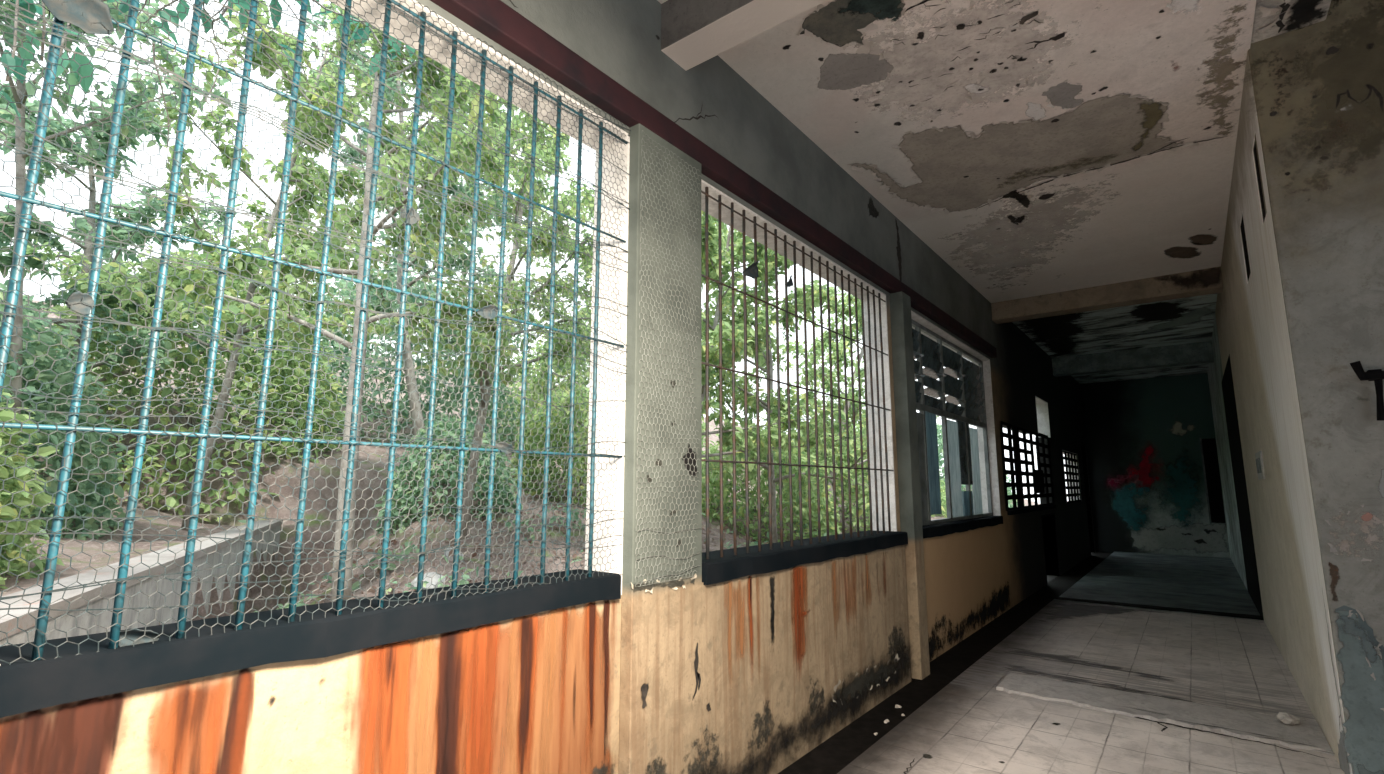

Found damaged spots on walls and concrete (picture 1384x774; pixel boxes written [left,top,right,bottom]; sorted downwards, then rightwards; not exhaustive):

peeling [783,0,1211,230]
water stain [1288,0,1384,191]
rust [728,576,760,669]
rust [792,567,810,667]
water stain [928,582,1010,661]
rust [0,692,125,774]
rust [150,668,254,774]
rust [359,600,611,774]
water stain [646,758,666,774]
water stain [683,626,911,774]
peeling [1335,605,1384,774]